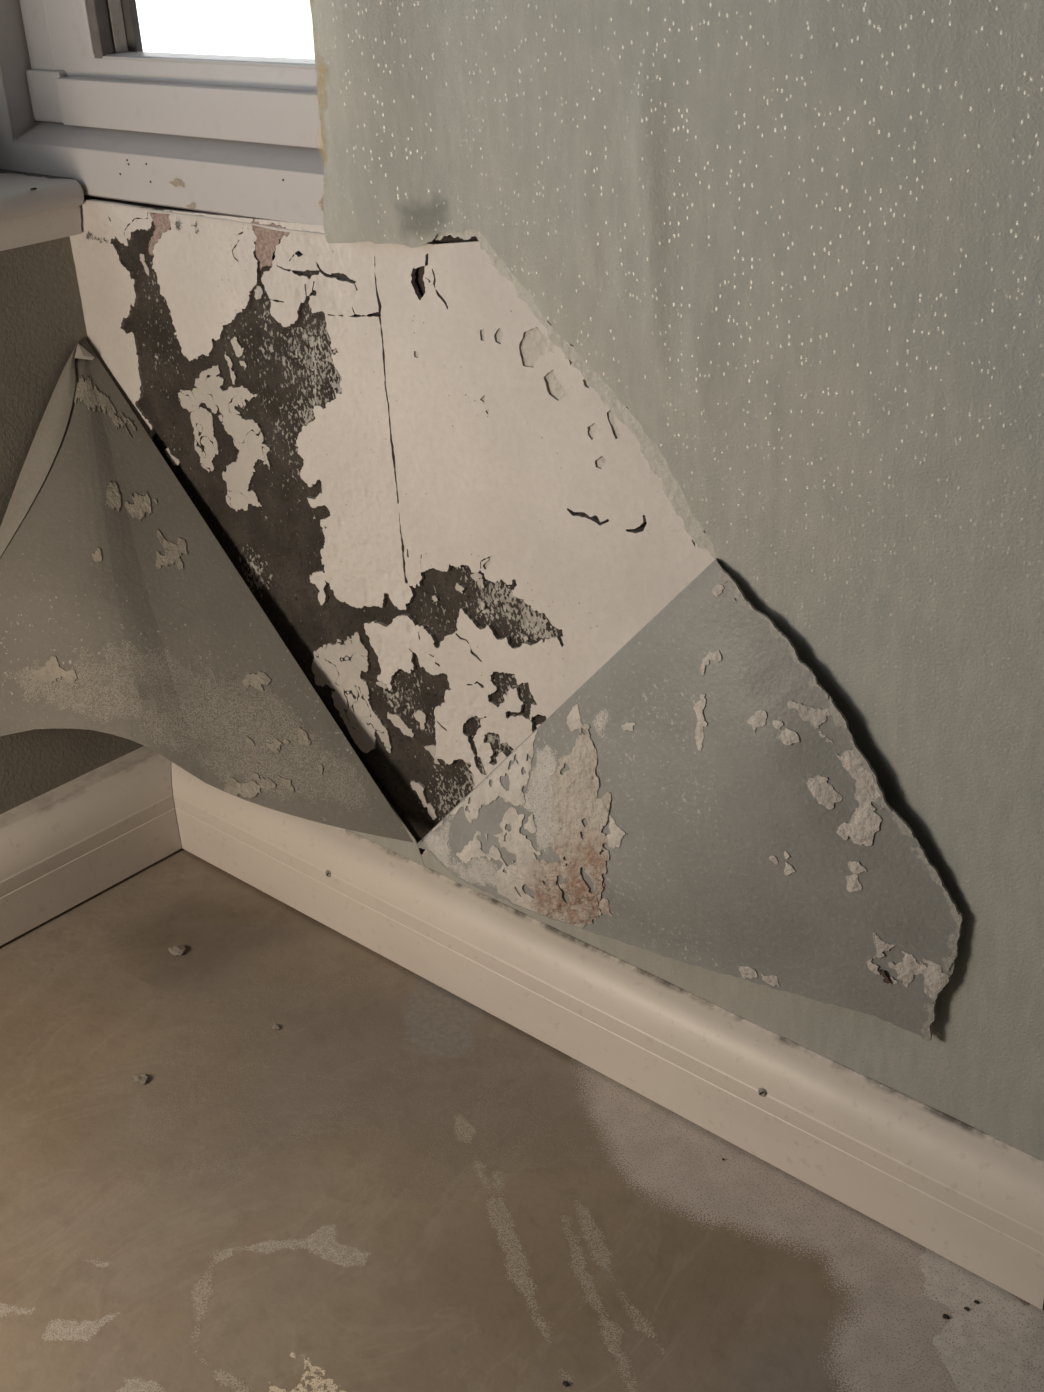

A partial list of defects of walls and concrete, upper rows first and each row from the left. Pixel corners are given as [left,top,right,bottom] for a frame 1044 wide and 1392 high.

flaking render [114,207,568,855]
flaking render [589,410,620,438]
water stain [41,1312,120,1344]
water stain [191,1224,371,1392]
water stain [453,1113,554,1345]
water stain [559,1058,1044,1392]